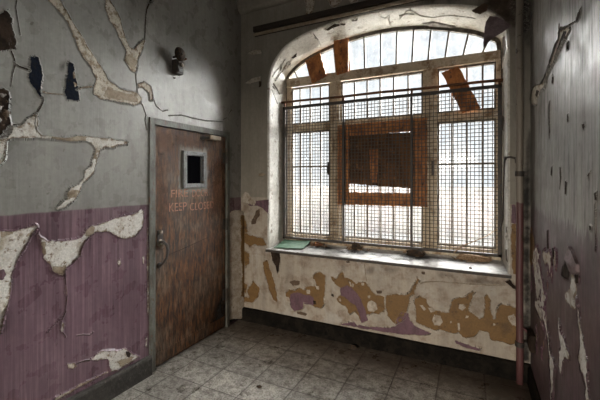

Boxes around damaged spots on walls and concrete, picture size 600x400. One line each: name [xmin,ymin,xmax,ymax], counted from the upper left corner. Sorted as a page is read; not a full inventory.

peeling [47,0,154,106]
peeling [472,3,512,84]
peeling [529,6,582,107]
peeling [0,93,129,211]
peeling [242,191,269,213]
peeling [0,208,149,335]
flaking render [270,252,281,274]
peeling [530,225,591,400]
peeling [53,348,140,400]